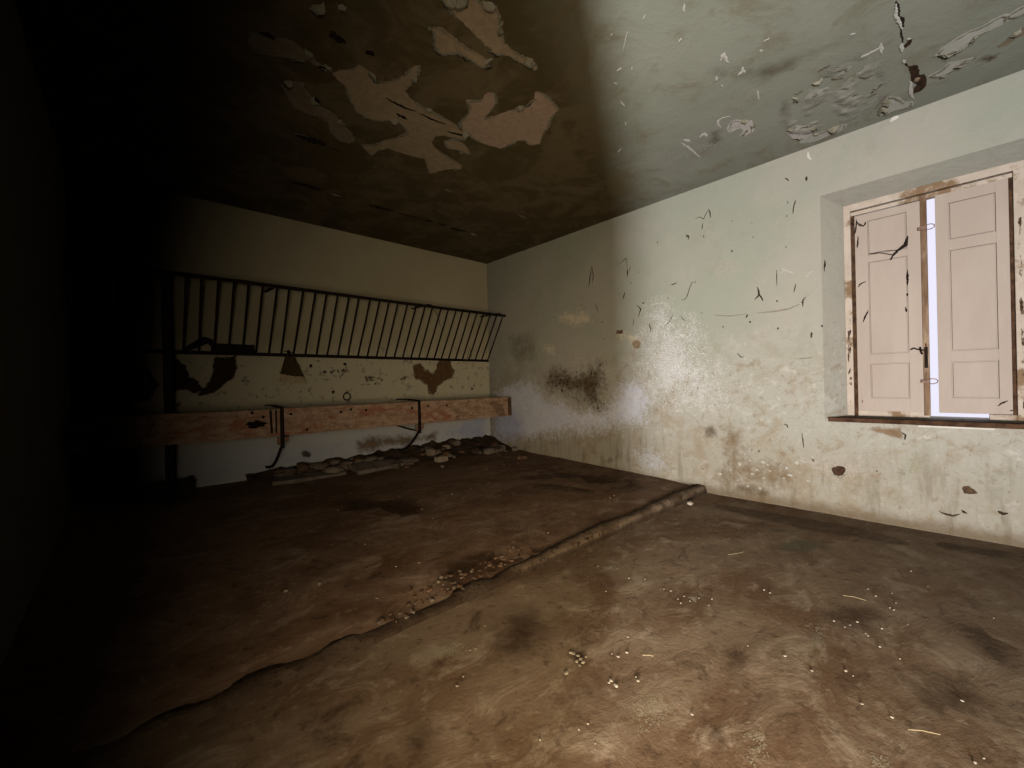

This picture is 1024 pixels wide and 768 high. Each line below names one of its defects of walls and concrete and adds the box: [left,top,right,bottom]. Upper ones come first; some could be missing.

peeling [427,0,538,71]
peeling [928,5,1024,79]
peeling [247,32,560,174]
peeling [880,96,914,122]
peeling [727,119,755,137]
flaking render [400,361,455,395]
damp [427,292,735,445]
damp [358,437,413,451]
flaking render [832,466,846,479]